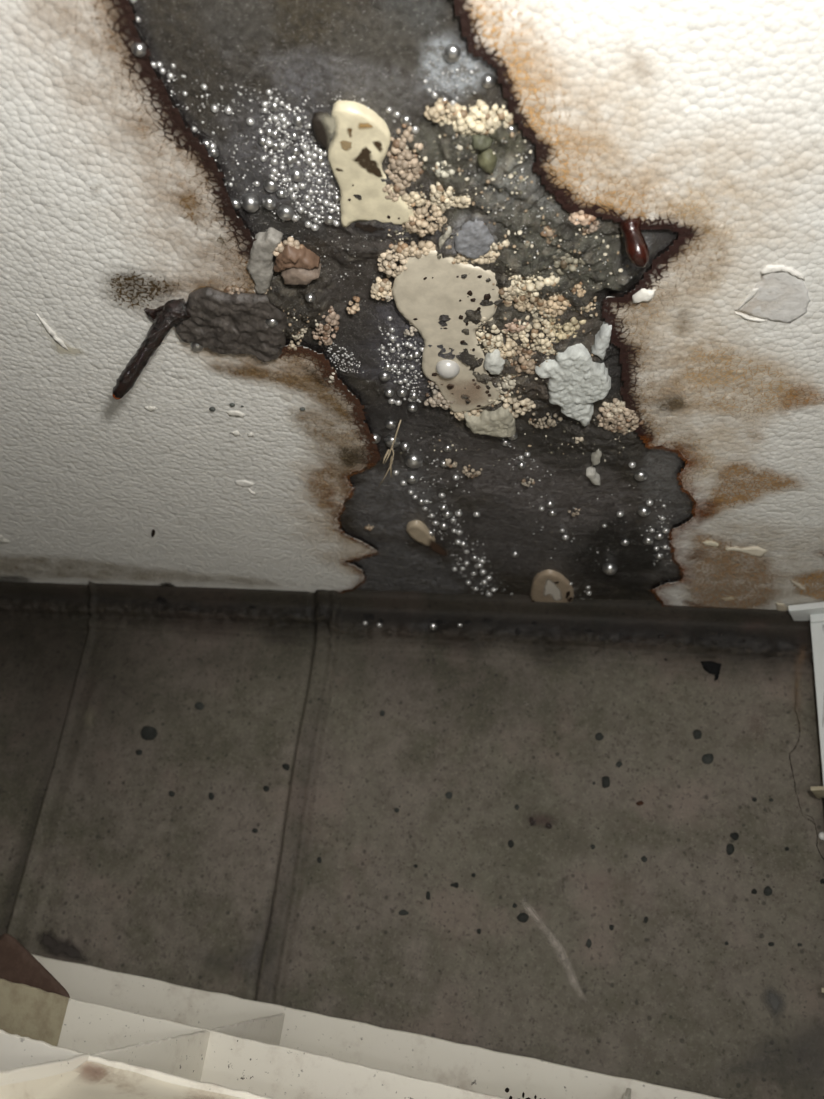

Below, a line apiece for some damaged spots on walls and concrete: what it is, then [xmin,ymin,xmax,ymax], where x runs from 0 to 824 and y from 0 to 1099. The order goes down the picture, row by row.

water stain [107,268,182,309]
water stain [75,0,257,290]
water stain [454,0,730,482]
spalling [734,265,810,323]
water stain [215,346,381,573]